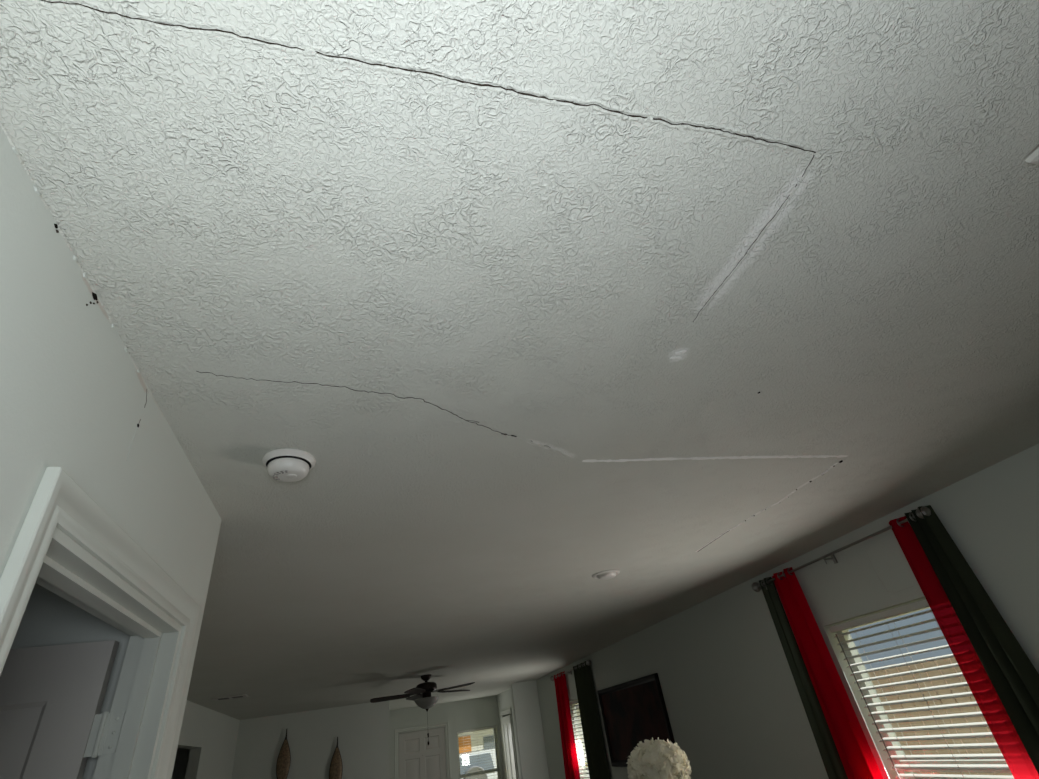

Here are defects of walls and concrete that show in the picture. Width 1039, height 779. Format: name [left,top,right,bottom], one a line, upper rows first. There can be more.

crack [14,0,839,322]
crack [194,371,582,462]